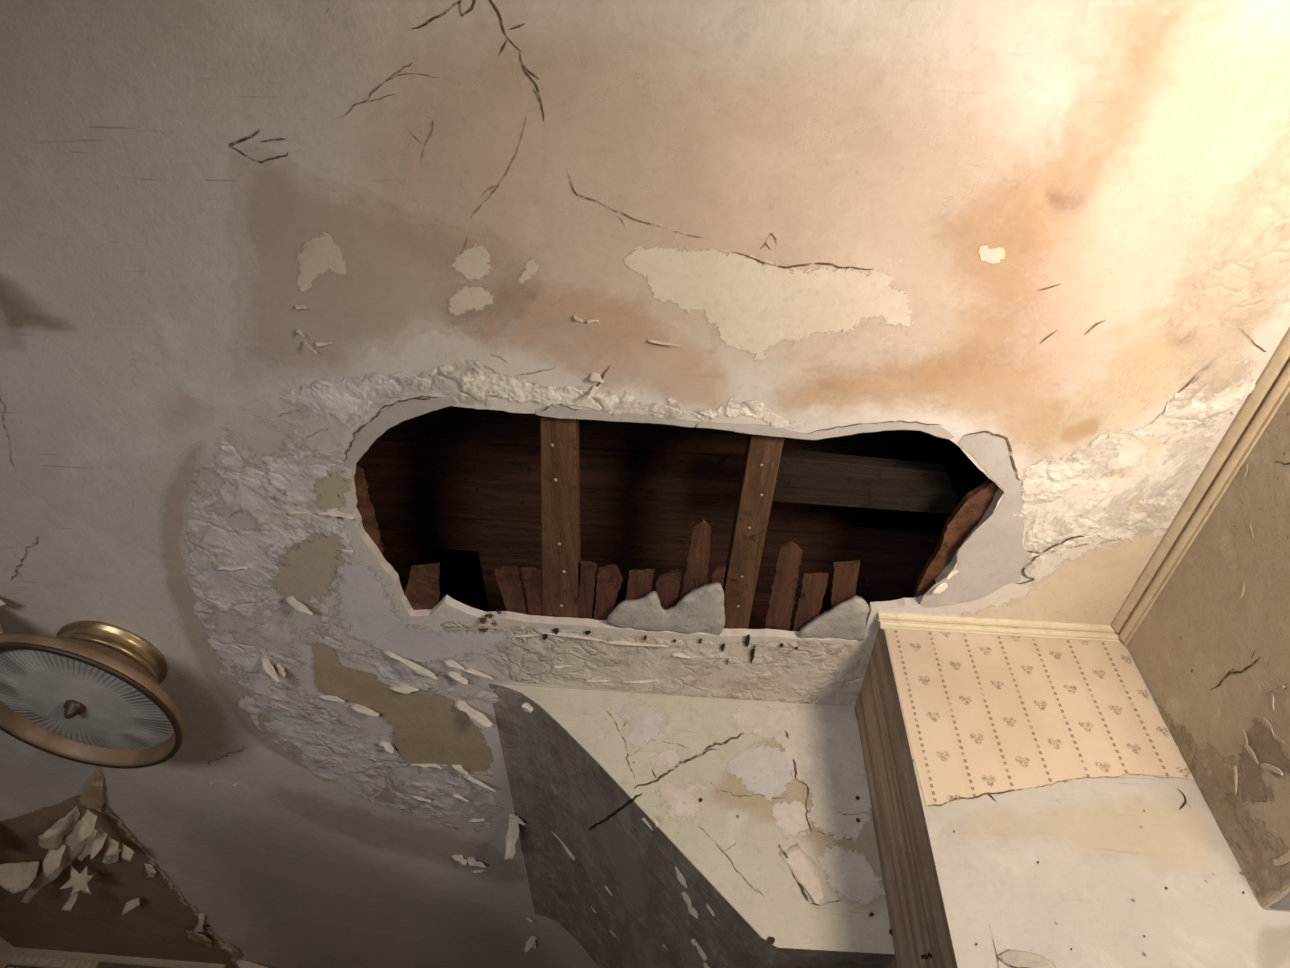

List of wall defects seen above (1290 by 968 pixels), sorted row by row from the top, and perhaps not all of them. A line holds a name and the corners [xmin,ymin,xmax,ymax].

crack [342,63,433,117]
crack [412,0,545,246]
peeling [448,244,494,316]
crack [569,177,701,238]
peeling [624,244,914,361]
crack [734,233,872,270]
flaking render [536,373,1168,625]
peeling [269,396,725,792]
flaking render [798,595,870,641]
crack [1211,649,1260,690]
peeling [726,705,886,909]
peeling [0,766,268,968]